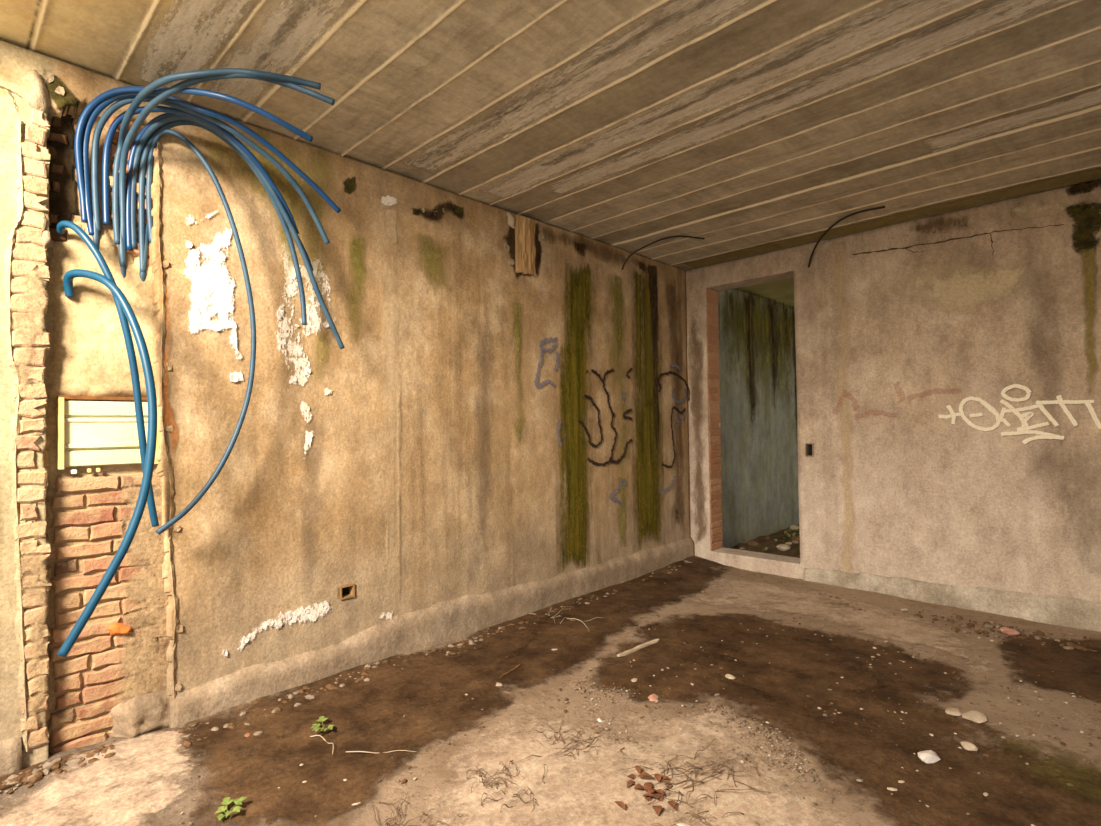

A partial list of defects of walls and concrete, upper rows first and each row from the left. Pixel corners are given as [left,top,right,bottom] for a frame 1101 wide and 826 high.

flaking render [4,71,183,754]
peeling [183,227,242,359]
peeling [230,372,243,382]
peeling [275,243,335,386]
peeling [300,401,313,459]
leakage [543,228,705,563]
leakage [727,294,756,423]
leakage [768,301,796,391]
leakage [1083,249,1097,379]
peeling [222,600,333,656]